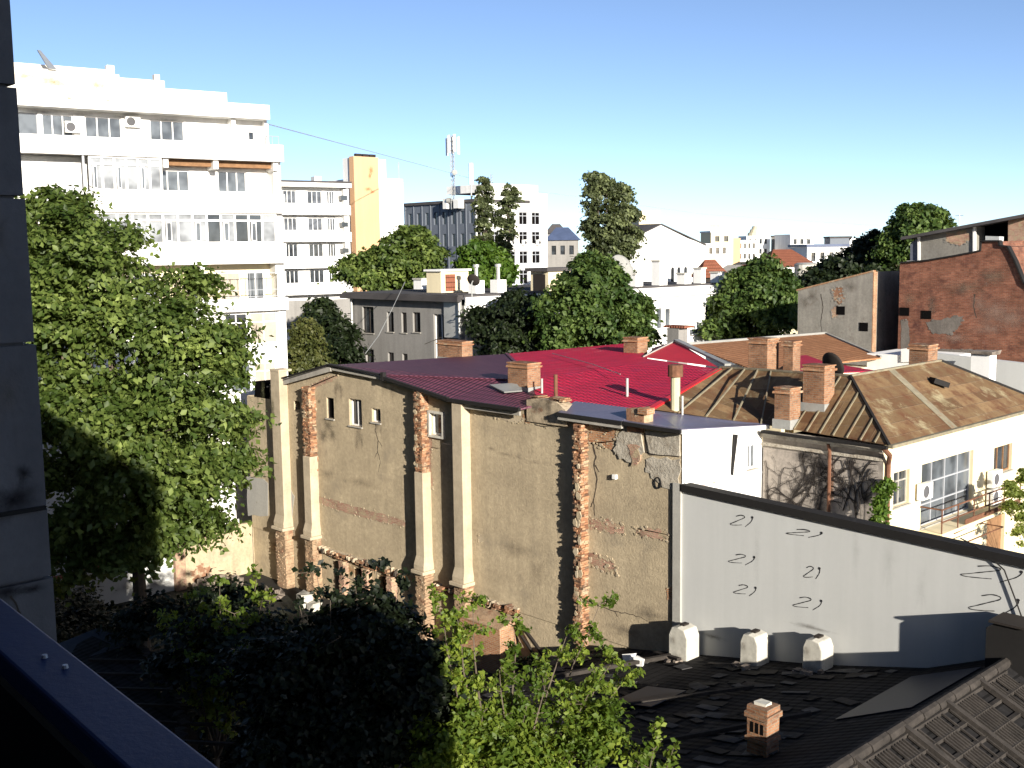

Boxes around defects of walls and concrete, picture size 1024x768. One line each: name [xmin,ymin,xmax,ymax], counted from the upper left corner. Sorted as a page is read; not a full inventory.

spalling [830,286,846,319]
peeling [926,315,964,351]
spalling [413,390,434,490]
spalling [319,496,406,528]
spalling [572,423,670,650]